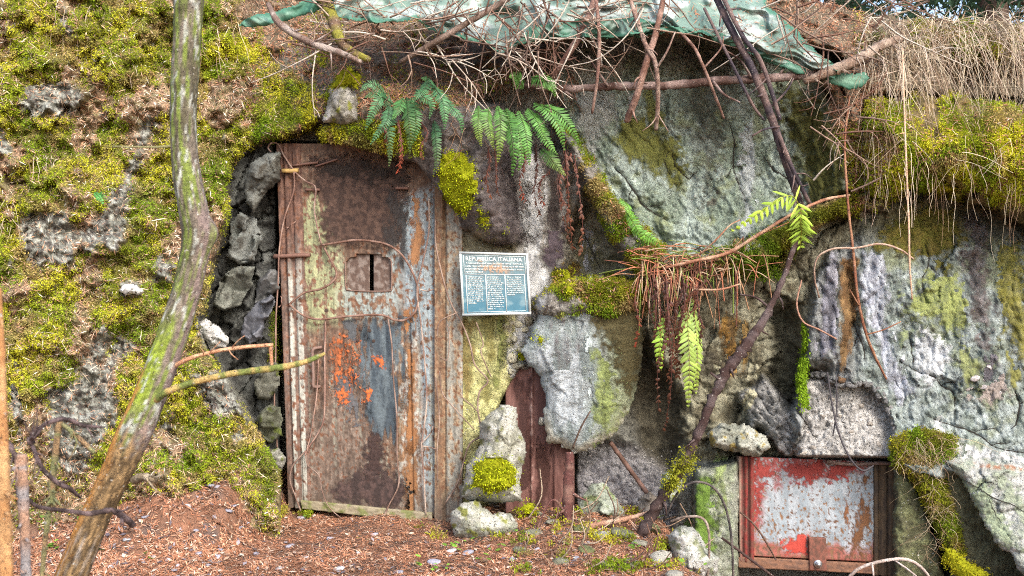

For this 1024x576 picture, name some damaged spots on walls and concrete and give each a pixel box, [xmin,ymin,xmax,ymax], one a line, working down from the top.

rust [310,151,423,270]
rust [403,307,416,334]
rust [330,347,421,510]
peeling [780,534,809,555]
rust [844,474,871,558]